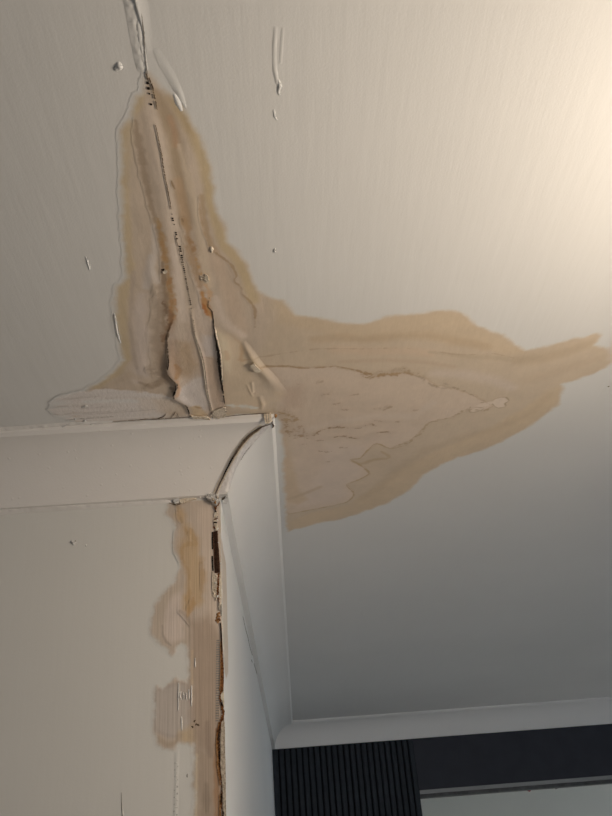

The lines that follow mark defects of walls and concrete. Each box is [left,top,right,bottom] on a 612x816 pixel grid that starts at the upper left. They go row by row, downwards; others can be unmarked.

crack [123,0,187,207]
crack [74,336,191,422]
damp [83,69,612,533]
damp [148,498,225,816]
flaking render [212,508,226,816]